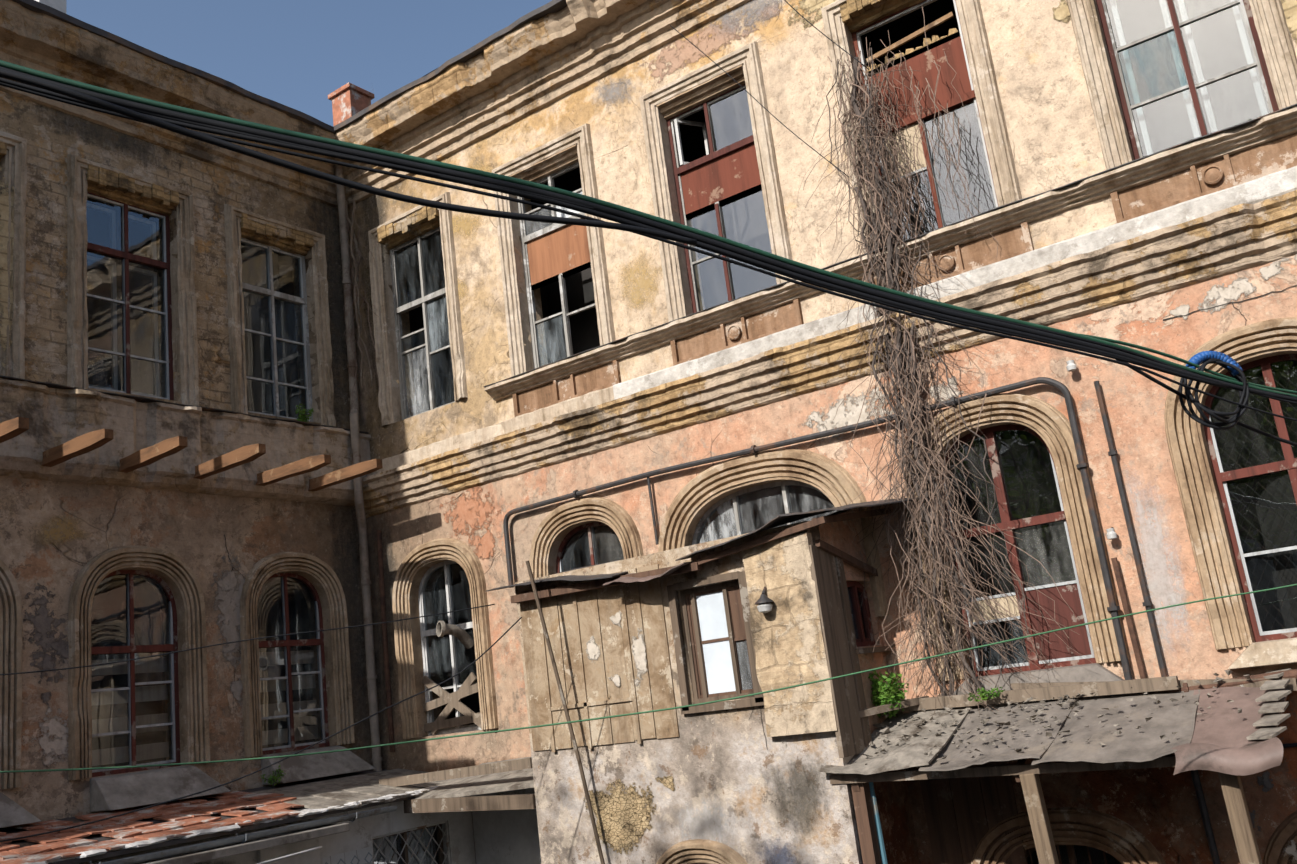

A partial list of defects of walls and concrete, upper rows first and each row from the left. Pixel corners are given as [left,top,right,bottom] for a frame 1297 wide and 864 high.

spalling [1281,0,1297,42]
spalling [22,577,69,776]
spalling [583,775,675,858]
peeling [1284,840,1297,860]